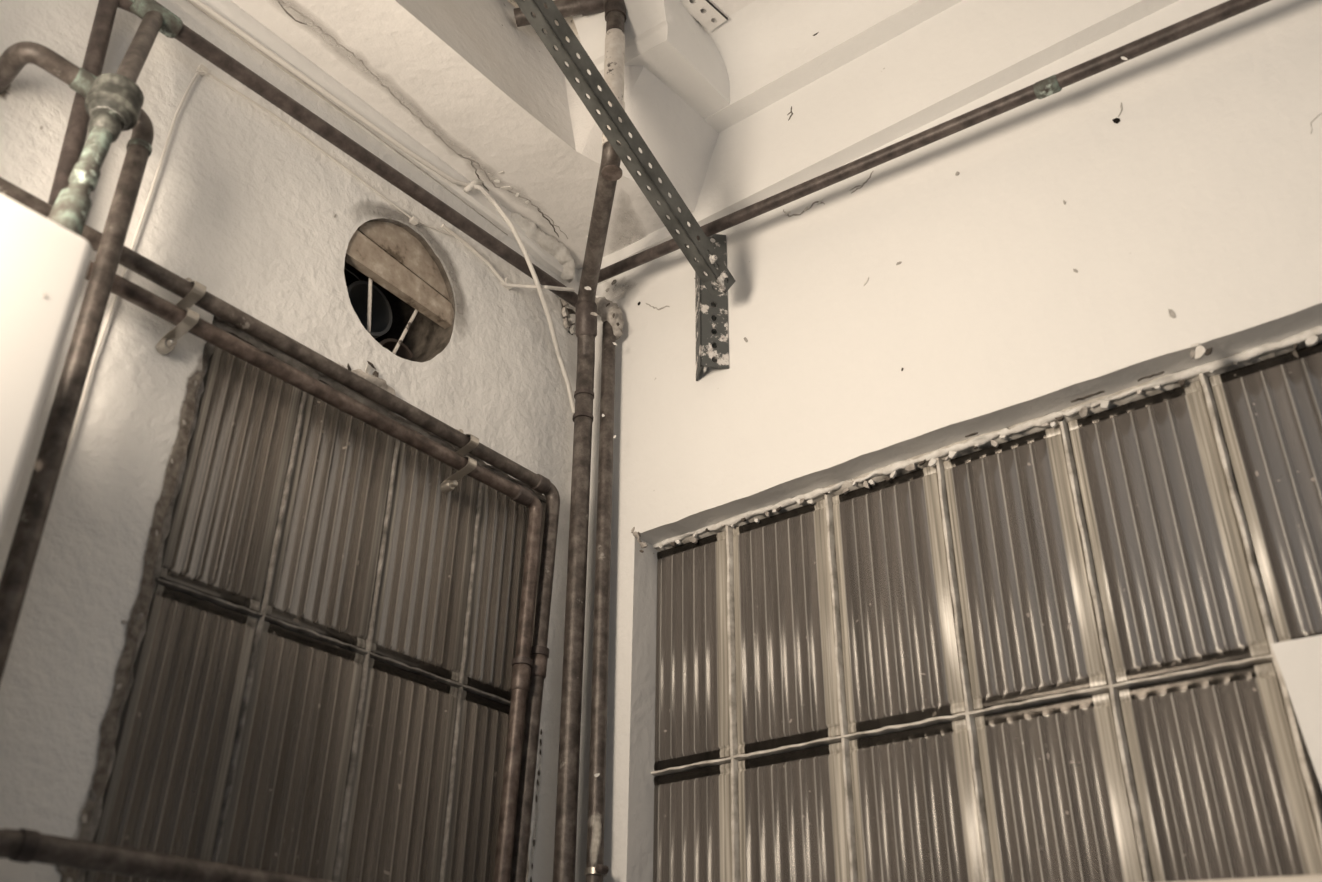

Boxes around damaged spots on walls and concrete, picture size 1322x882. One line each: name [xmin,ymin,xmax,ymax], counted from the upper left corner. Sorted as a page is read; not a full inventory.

crack [236,0,568,239]